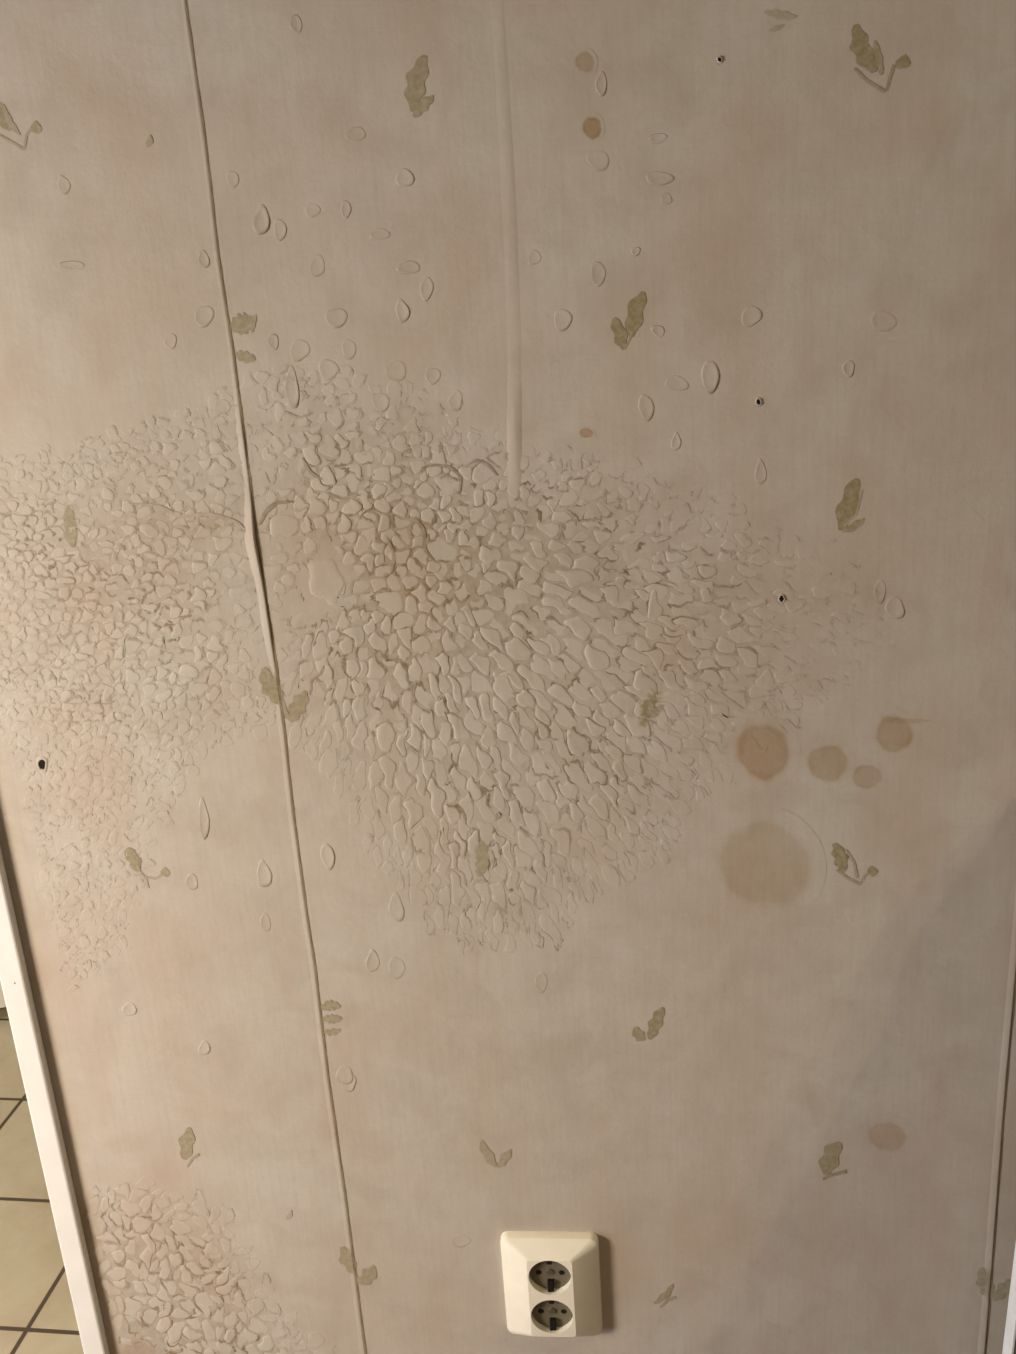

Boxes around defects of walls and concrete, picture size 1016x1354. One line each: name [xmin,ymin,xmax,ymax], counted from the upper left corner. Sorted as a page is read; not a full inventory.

crack [0,0,553,1354]
water stain [49,393,1007,793]
crack [501,598,574,674]
crack [405,664,708,951]
crack [517,452,831,756]
water stain [704,805,826,923]